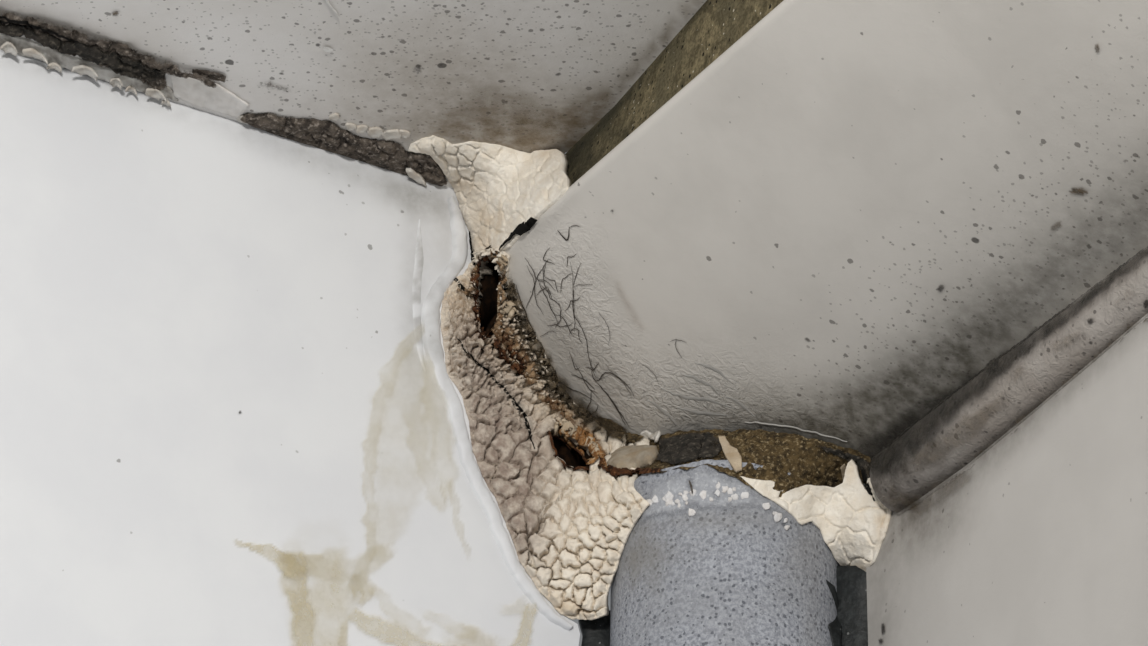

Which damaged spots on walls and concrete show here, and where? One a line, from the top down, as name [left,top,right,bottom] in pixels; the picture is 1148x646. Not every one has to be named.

peeling [0,33,249,119]
peeling [497,300,519,319]
corrosion [457,249,661,478]
crack [516,225,660,425]
damp [862,247,1148,470]
peeling [554,417,600,454]
peeling [641,436,790,531]